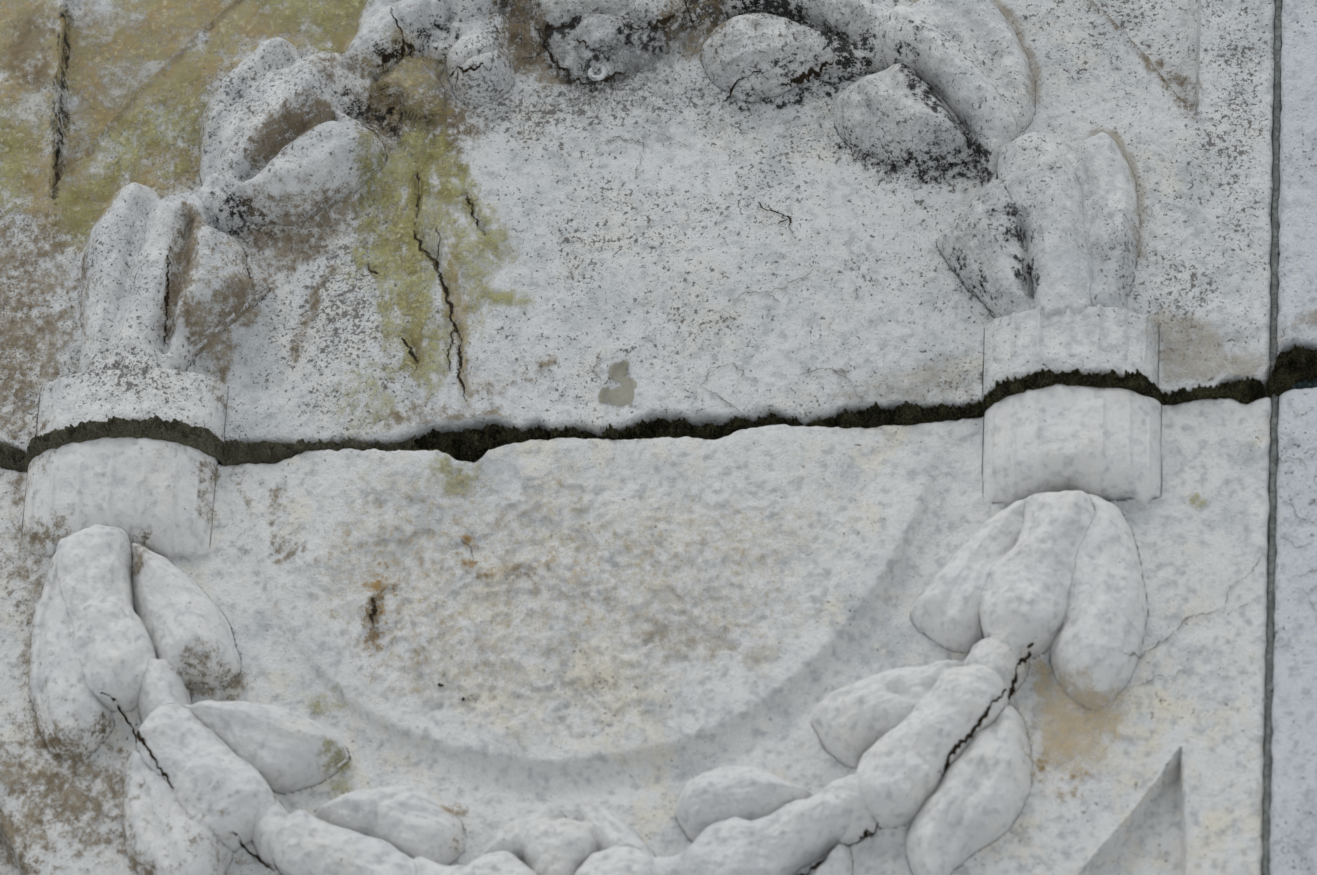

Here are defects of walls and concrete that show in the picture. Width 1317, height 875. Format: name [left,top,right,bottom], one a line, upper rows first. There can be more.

water stain [0,5,102,443]
water stain [156,47,516,408]
crack [466,193,486,236]
crack [401,170,467,401]
crack [700,363,744,412]
crack [803,366,863,404]
crack [100,692,174,790]
crack [938,643,1034,776]
crack [232,831,275,872]
crack [798,815,878,875]